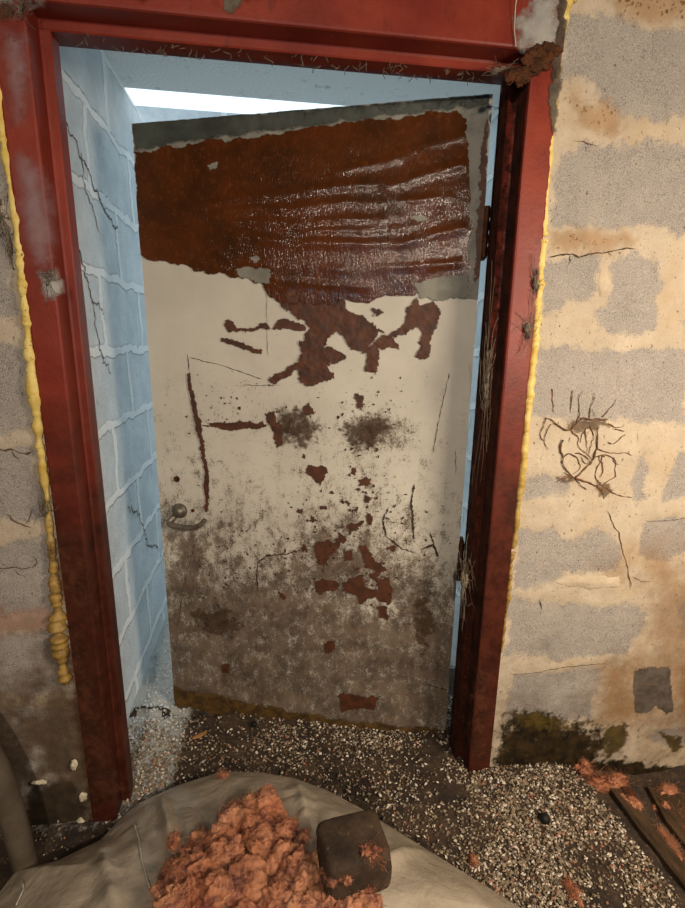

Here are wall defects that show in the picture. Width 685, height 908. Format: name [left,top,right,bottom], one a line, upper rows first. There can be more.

peeling [221,288,442,386]
rust [134,0,568,769]
peeling [354,393,364,410]
peeling [207,411,284,448]
peeling [302,454,328,485]
peeling [284,467,400,620]
peeling [324,641,335,654]
leakage [173,685,446,733]
peeling [338,692,380,712]
leakage [492,710,673,775]
leakage [660,732,683,752]